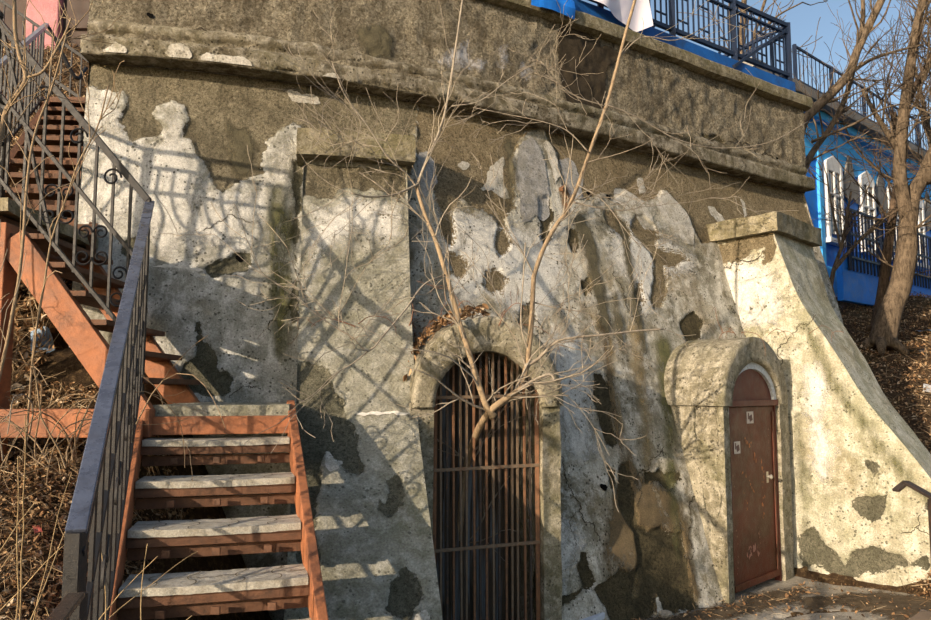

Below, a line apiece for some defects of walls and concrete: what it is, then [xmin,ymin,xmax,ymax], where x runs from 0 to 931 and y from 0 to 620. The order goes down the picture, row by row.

flaking render [103,42,127,53]
flaking render [165,43,252,66]
flaking render [88,64,812,323]
water stain [267,189,291,355]
water stain [574,214,699,599]
flaking render [296,362,365,528]
flaking render [852,494,888,522]
flaking render [797,526,931,579]
flaking render [385,566,430,620]
crack [786,607,877,618]